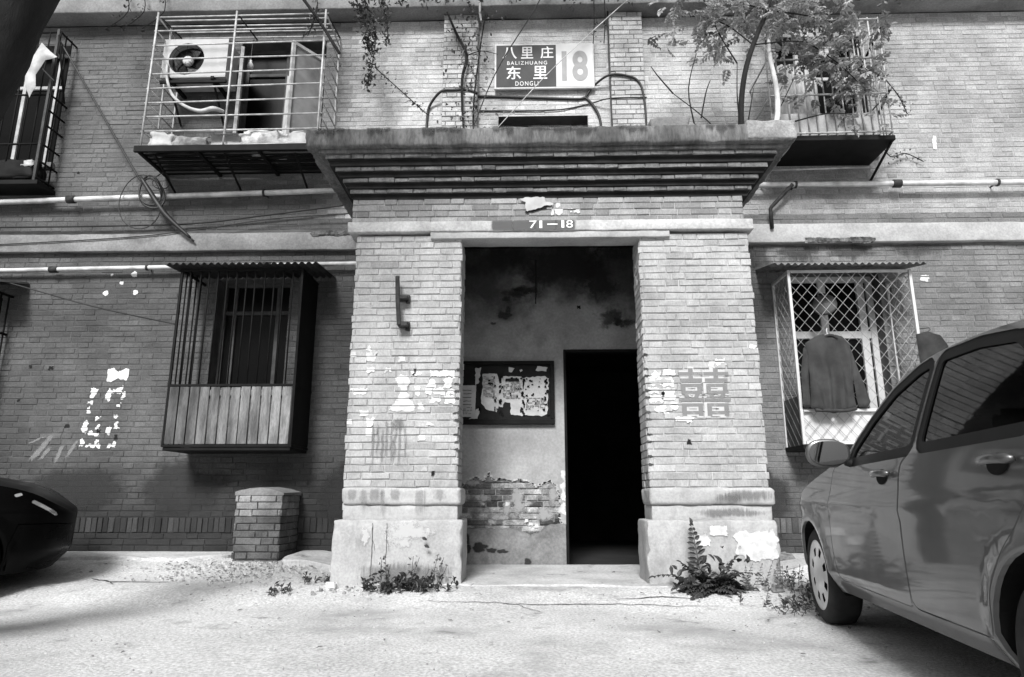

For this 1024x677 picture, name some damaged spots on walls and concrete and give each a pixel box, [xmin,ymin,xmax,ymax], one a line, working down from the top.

peeling [64,368,129,449]
peeling [347,345,460,451]
peeling [643,353,694,465]
flaking render [461,467,566,535]
peeling [694,526,779,562]